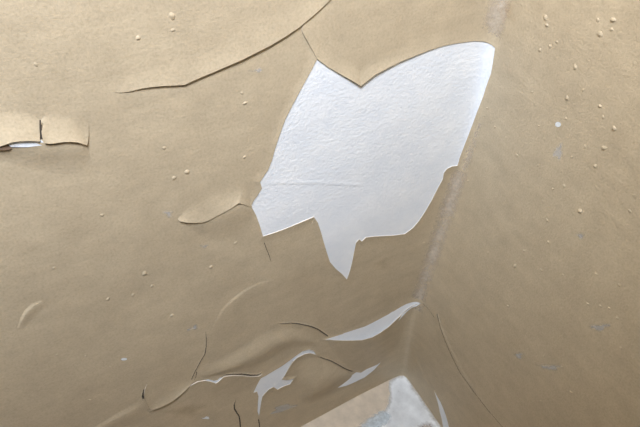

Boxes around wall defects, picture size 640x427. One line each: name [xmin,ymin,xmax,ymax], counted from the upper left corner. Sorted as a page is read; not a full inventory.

peeling [112,0,329,93]
peeling [0,111,91,174]
peeling [178,25,505,288]
crack [190,331,208,381]
peeling [140,297,427,421]
crack [232,399,261,427]
peeling [433,388,452,427]